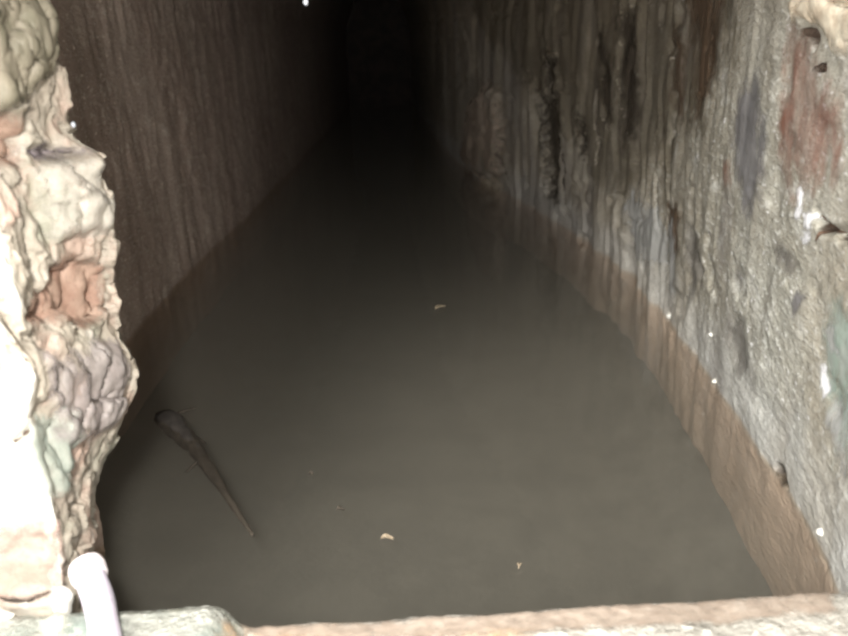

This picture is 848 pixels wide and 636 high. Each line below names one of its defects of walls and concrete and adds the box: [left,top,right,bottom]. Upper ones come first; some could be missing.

spalling [788,0,848,53]
leakage [615,13,641,141]
leakage [688,0,722,115]
spalling [0,112,24,163]
spalling [27,143,85,159]
leakage [624,191,705,295]
spalling [25,253,106,327]
leakage [792,292,802,313]
leakage [733,321,747,375]
leakage [820,364,831,398]
spalling [0,522,62,604]